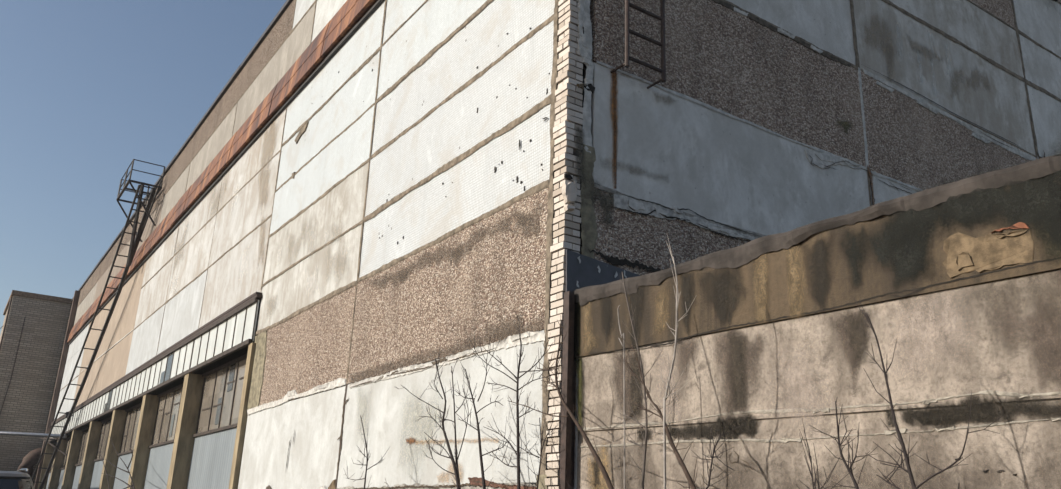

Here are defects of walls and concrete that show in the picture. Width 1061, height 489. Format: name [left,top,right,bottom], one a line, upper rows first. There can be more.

crack [809,155,912,205]
flaking render [612,194,758,241]
leakage [787,241,831,316]
leakage [846,170,1061,377]
spalling [943,222,1034,278]
flaking render [247,331,545,415]
leakage [836,311,870,378]
leakage [885,395,1061,428]